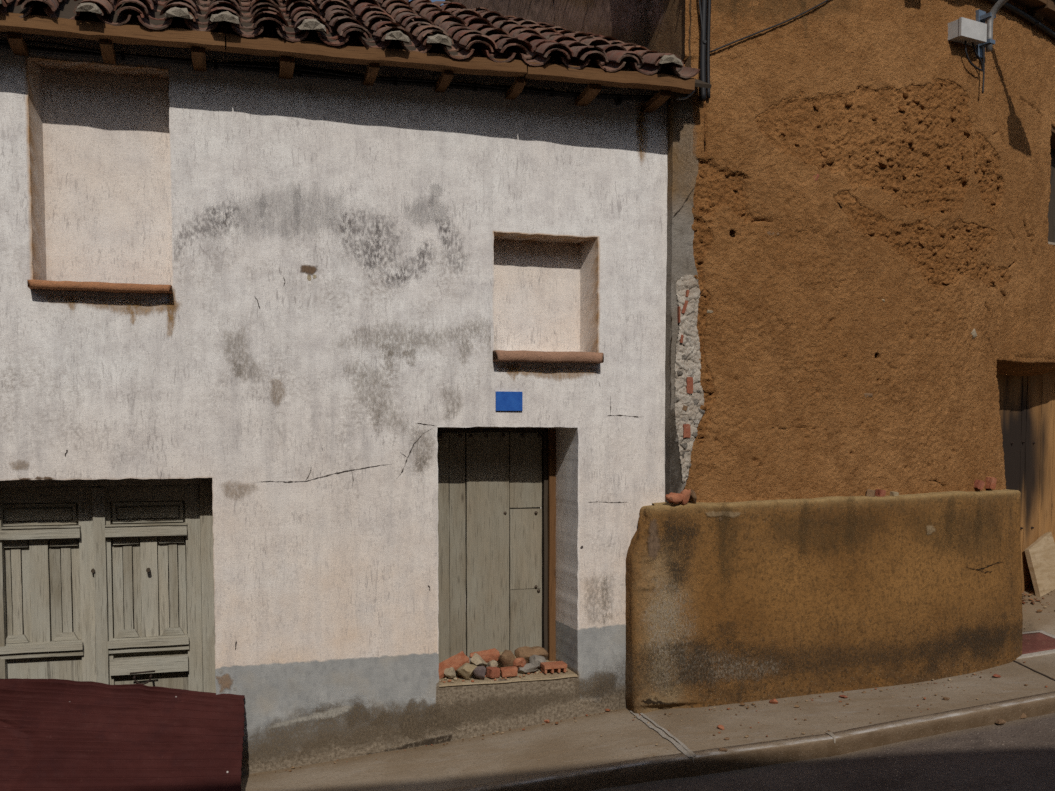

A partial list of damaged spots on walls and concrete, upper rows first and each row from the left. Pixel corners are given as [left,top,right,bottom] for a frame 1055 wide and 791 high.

spalling [674,275,707,483]
crack [263,423,435,485]
leakage [242,674,615,763]